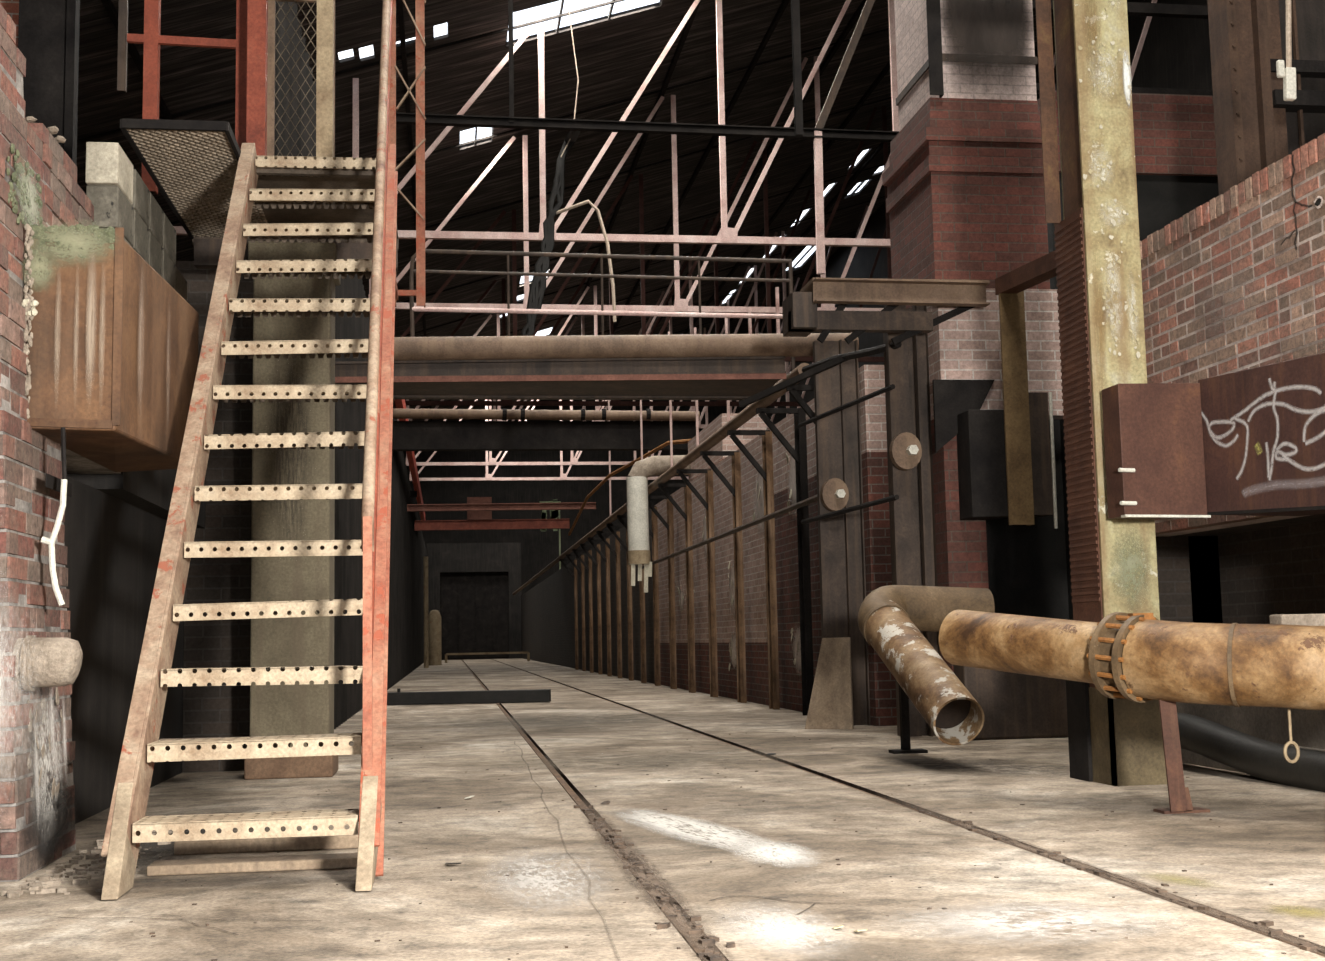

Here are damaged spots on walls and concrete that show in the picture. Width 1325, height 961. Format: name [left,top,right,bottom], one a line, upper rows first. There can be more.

peeling [1078,36,1131,104]
peeling [1083,125,1112,187]
corrosion [56,279,104,378]
peeling [1100,199,1141,359]
damp [27,697,74,860]